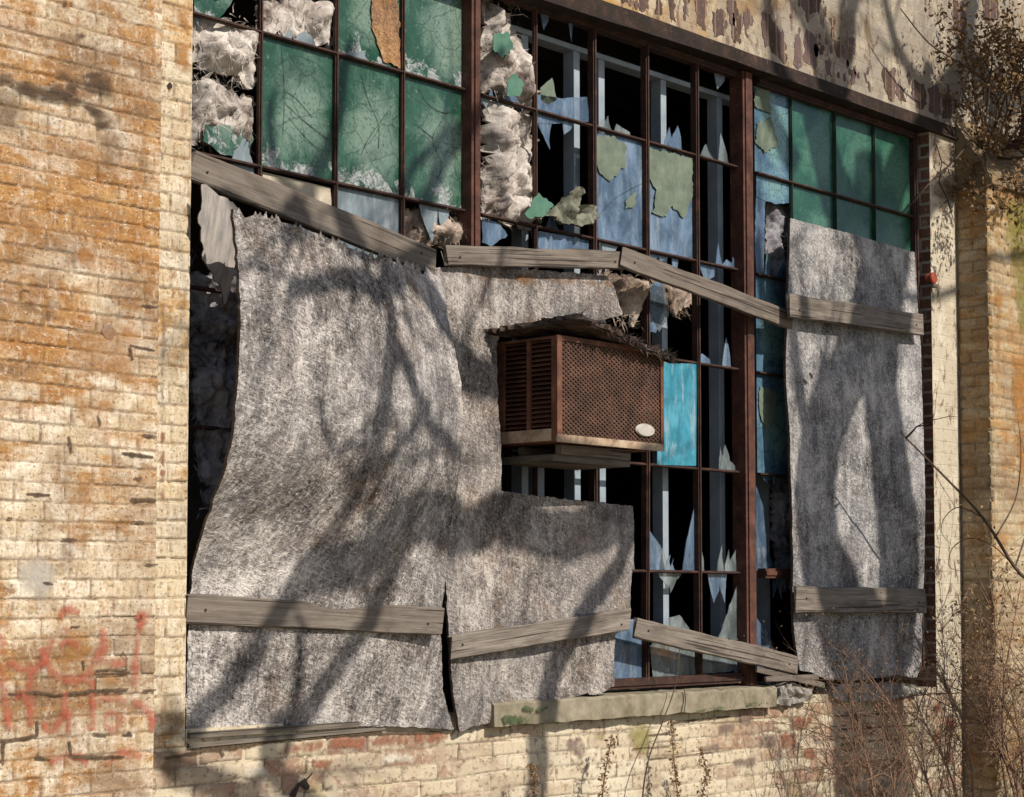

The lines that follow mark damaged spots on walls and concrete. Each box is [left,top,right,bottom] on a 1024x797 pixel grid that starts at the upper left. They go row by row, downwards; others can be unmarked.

peeling [621,0,871,92]
water stain [60,73,110,95]
water stain [84,105,108,129]
peeling [754,87,778,153]
peeling [882,67,952,119]